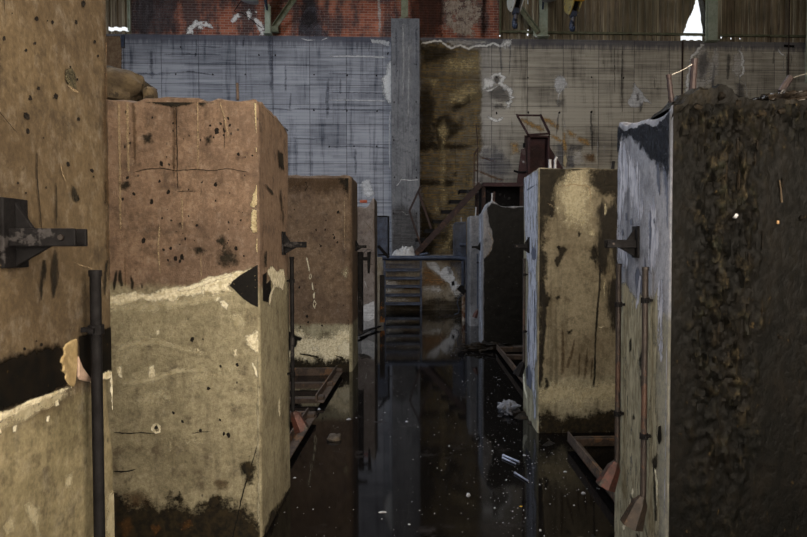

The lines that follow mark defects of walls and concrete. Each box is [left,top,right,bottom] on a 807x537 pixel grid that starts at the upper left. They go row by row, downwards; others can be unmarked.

efflorescence [186,20,213,34]
efflorescence [231,9,264,36]
leakage [367,33,400,167]
crack [133,106,246,192]
leakage [386,0,514,339]
rust [521,119,594,167]
spalling [228,185,258,254]
leakage [265,178,349,247]
peeling [60,339,91,387]
leakage [363,302,374,321]
leakage [510,141,669,537]
spalling [246,330,260,526]